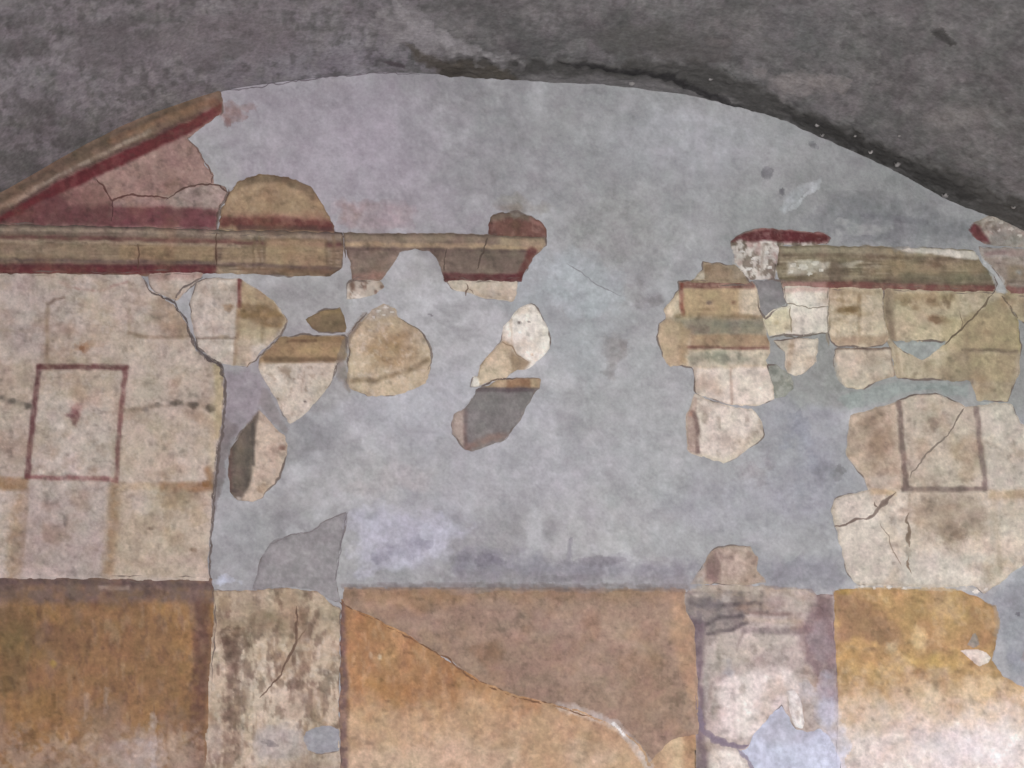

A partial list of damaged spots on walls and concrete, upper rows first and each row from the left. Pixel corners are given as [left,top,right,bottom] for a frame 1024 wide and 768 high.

spalling [512,53,1024,240]
crack [96,138,287,579]
flaking render [346,277,398,319]
peeling [732,242,831,279]
peeling [902,248,978,259]
crack [945,294,1018,345]
crack [835,408,964,574]
crack [260,606,306,697]
crack [270,512,592,716]
flaking render [961,649,991,666]